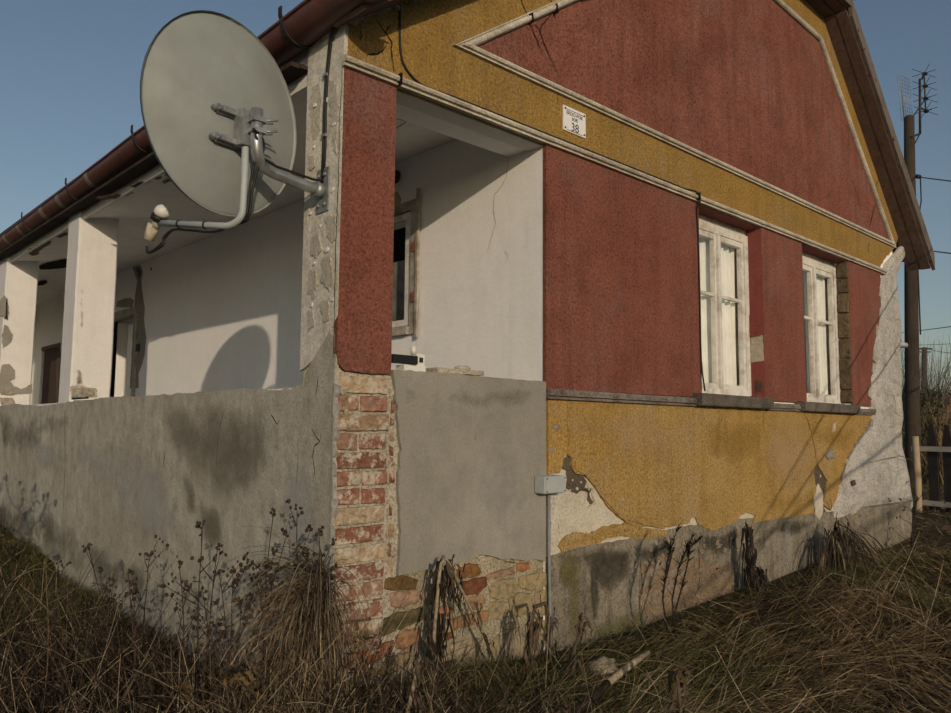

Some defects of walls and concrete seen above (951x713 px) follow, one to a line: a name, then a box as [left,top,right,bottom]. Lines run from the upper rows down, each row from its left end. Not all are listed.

crack [360,19,403,87]
crack [521,0,559,69]
flaking render [0,295,13,347]
flaking render [116,265,146,389]
flaking render [836,261,853,404]
flaking render [0,364,33,406]
flaking render [814,465,826,520]
peeling [545,456,754,622]
damp [590,552,627,617]